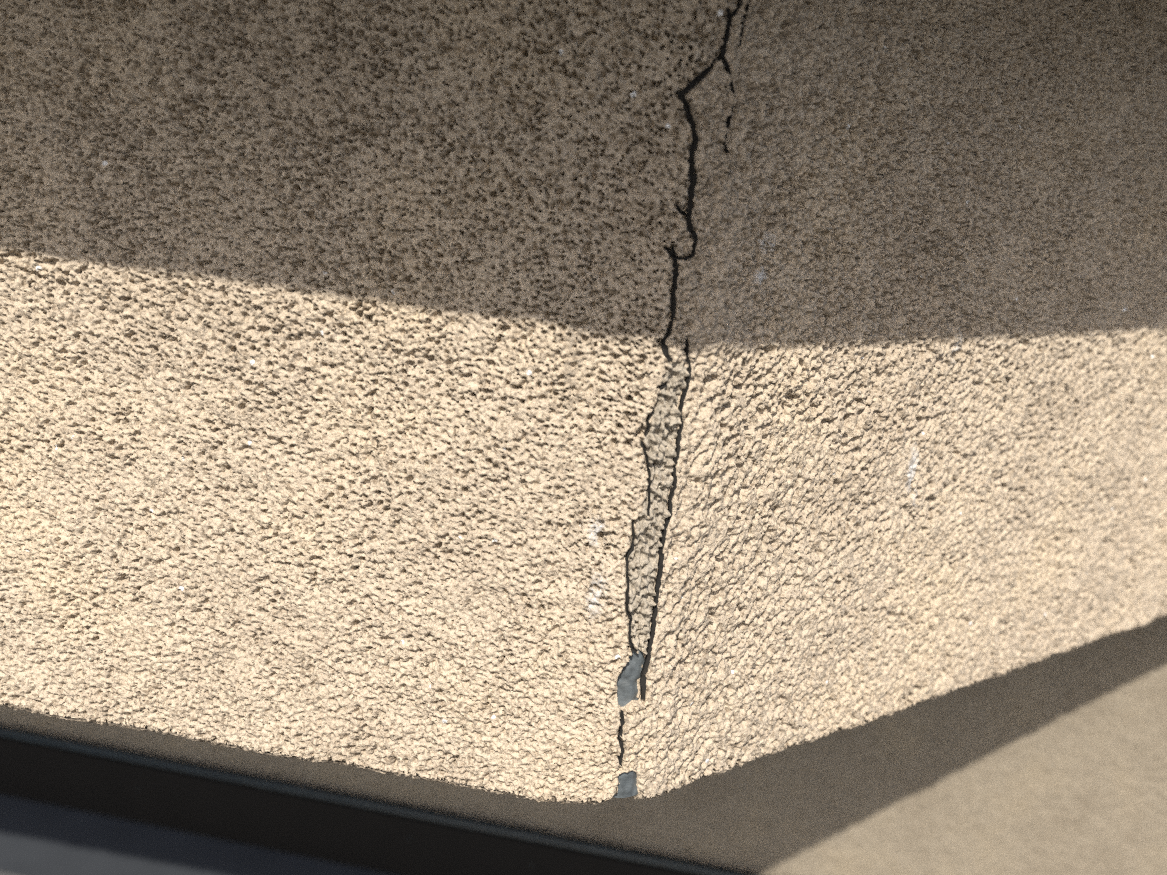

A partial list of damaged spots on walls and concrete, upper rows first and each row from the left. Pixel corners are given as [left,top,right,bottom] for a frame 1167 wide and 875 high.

flaking render [728,0,748,51]
flaking render [685,58,739,227]
crack [617,0,750,766]
spalling [617,361,690,707]
spalling [613,771,638,798]